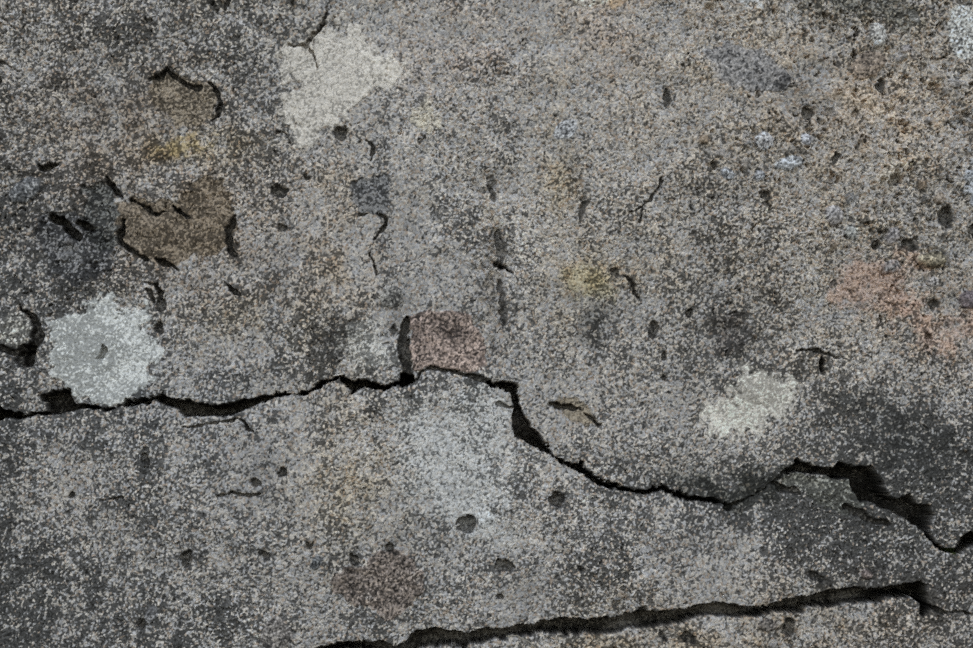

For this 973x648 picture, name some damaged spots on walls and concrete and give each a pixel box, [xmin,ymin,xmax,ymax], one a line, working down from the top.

crack [623,275,641,302]
crack [0,302,46,367]
crack [796,348,838,368]
crack [0,316,722,503]
crack [754,459,973,552]
crack [314,582,973,648]